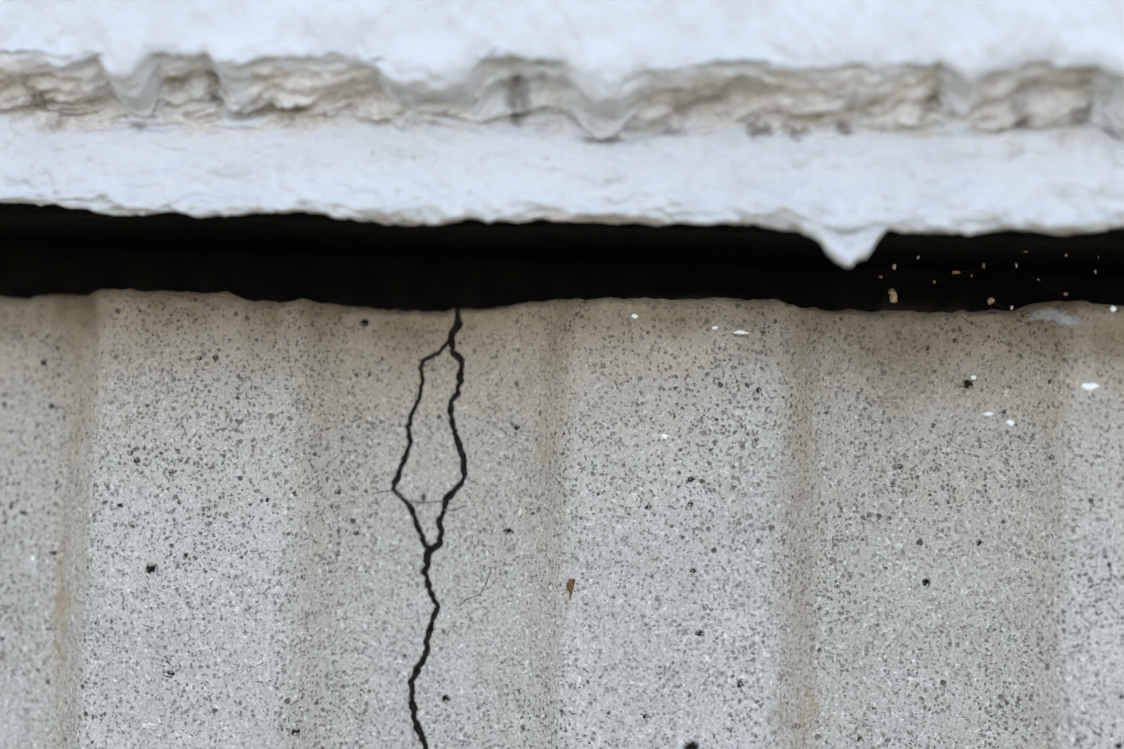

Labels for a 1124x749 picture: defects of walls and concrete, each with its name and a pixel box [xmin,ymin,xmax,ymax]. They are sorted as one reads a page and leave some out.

crack [374,307,492,749]